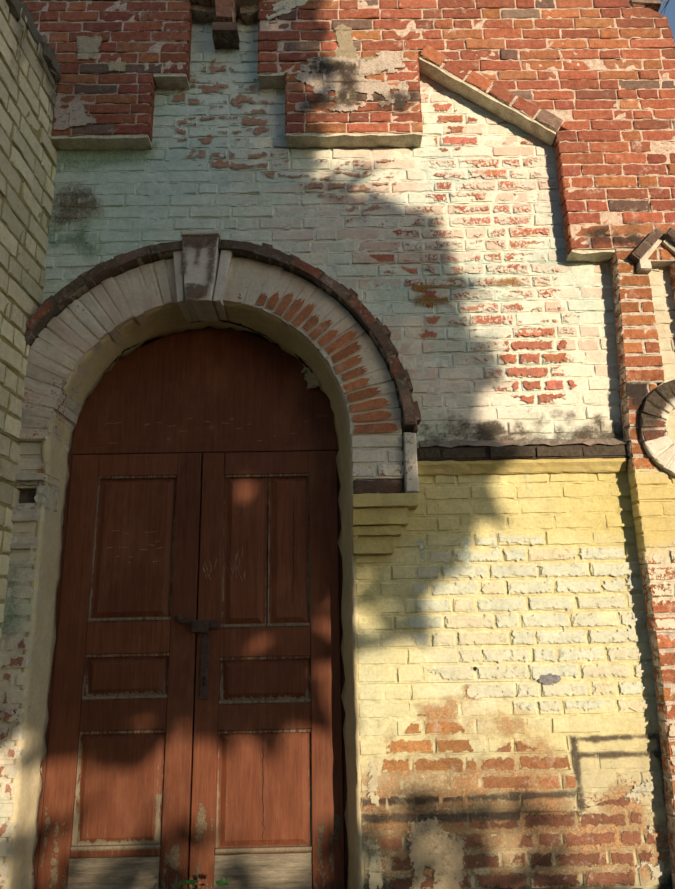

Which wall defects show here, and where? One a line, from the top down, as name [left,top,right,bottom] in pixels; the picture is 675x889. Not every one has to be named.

peeling [166,59,402,226]
damp [53,188,96,225]
peeling [369,103,581,412]
damp [23,235,539,442]
peeling [256,291,398,433]
spalling [368,310,421,433]
damp [556,415,623,439]
peeling [0,639,25,722]
peeling [0,749,15,796]
peeling [368,713,576,815]
peeling [367,779,665,889]